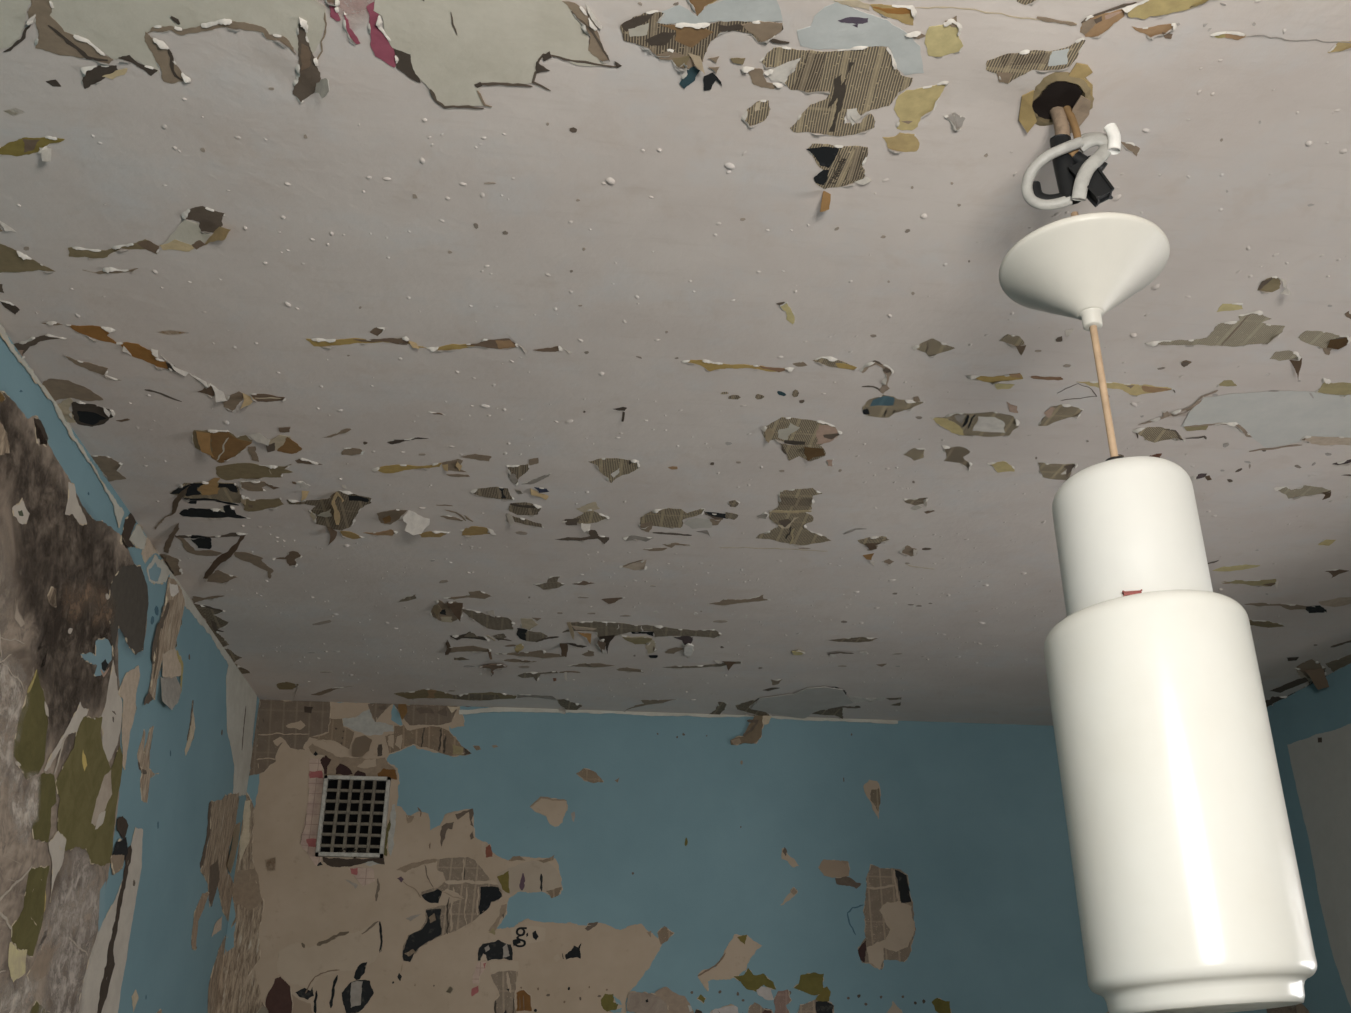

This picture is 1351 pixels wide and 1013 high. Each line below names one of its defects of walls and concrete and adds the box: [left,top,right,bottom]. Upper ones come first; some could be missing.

flaking render [49,0,327,73]
flaking render [373,0,614,109]
peeling [620,0,963,212]
peeling [1122,0,1226,26]
peeling [65,324,208,387]
flaking render [1132,303,1351,482]
peeling [470,458,551,535]
damp [0,408,122,731]
peeling [439,575,742,681]
flaking render [0,390,372,1013]
peeling [191,682,674,1013]
peeling [818,859,916,970]